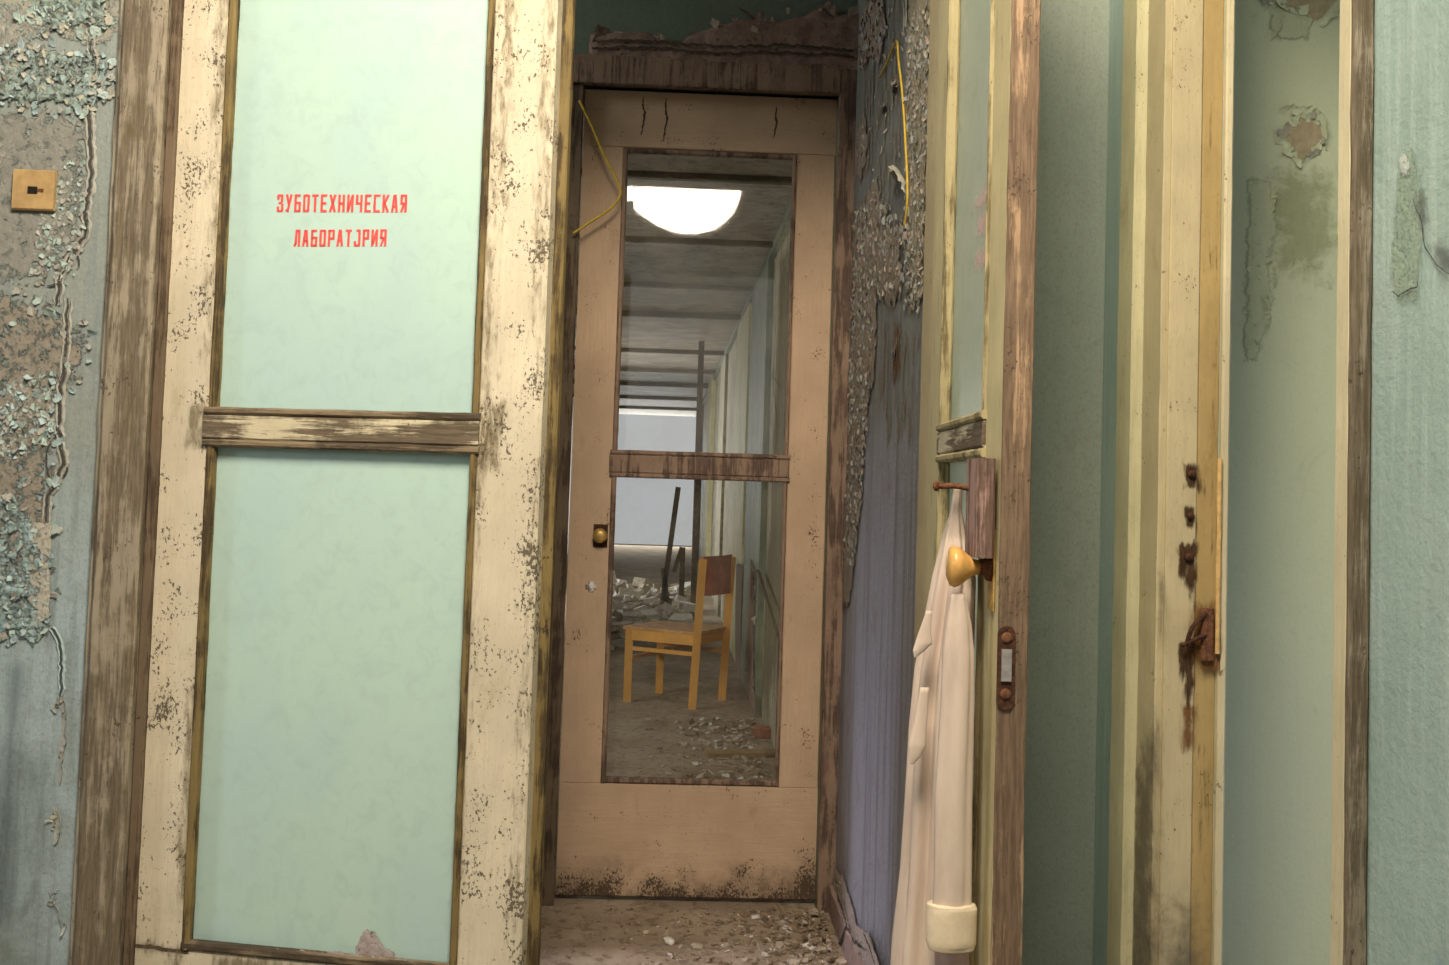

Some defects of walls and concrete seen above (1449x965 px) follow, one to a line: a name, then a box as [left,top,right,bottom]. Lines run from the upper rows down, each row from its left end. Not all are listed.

peeling [0,0,120,50]
flaking render [1260,0,1340,40]
flaking render [1275,104,1334,168]
peeling [0,101,98,639]
crack [42,33,100,523]
flaking render [842,0,930,613]
peeling [1392,150,1422,302]
rust [1186,463,1205,490]
rust [1178,507,1222,750]